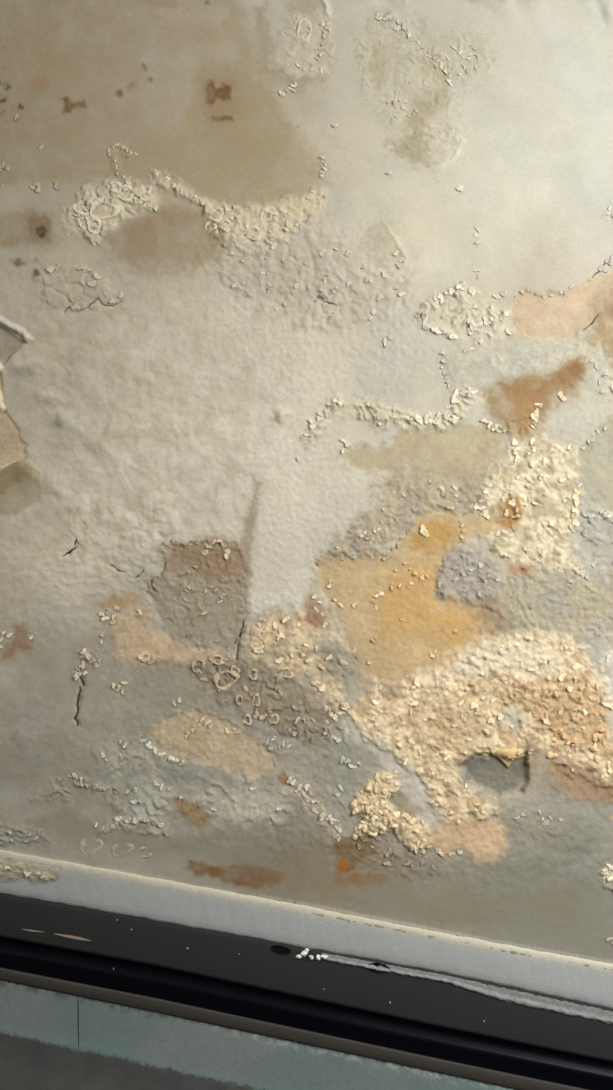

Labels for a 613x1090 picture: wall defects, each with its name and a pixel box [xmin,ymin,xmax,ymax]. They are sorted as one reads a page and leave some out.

water stain [0,0,339,218]
spalling [0,314,44,517]
flaking render [68,255,613,695]
peeling [0,810,62,884]
peeling [79,809,175,859]
flaking render [138,688,391,866]
flaking render [381,725,613,857]